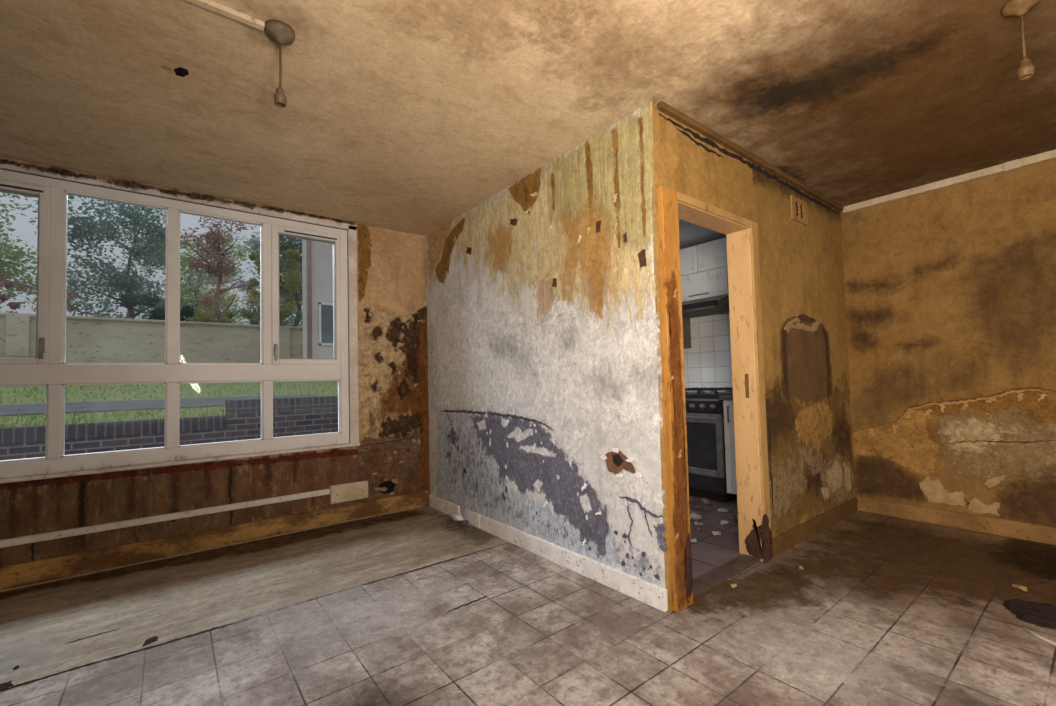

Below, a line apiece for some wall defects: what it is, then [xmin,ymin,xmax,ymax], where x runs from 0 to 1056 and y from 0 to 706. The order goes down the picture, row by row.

crack [659,113,840,214]
leakage [695,0,1056,207]
peeling [427,101,690,609]
spalling [781,314,1056,516]